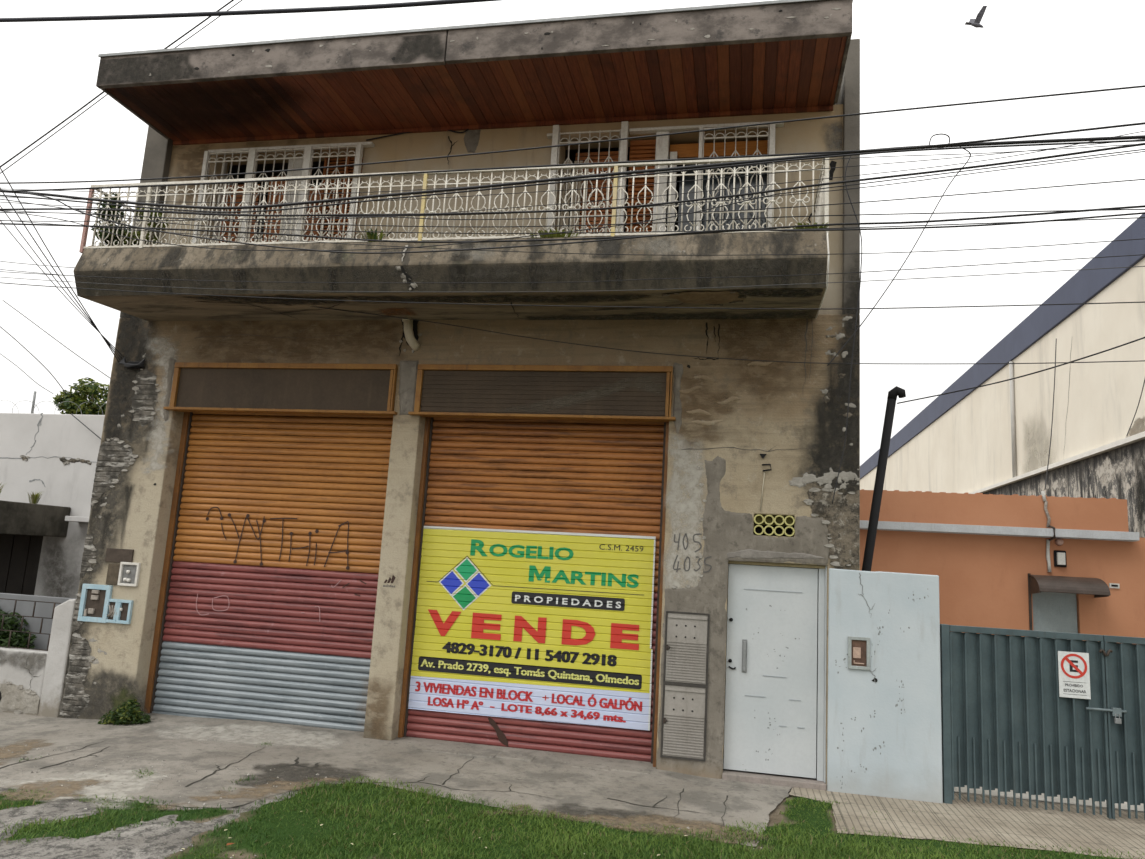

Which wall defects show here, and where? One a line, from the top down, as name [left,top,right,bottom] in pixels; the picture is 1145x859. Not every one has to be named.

leakage [394,35,443,63]
crack [0,413,91,487]
spalling [59,353,161,518]
leakage [45,313,175,598]
leakage [186,234,813,393]
peeling [665,437,707,589]
leakage [730,232,823,298]
spalling [789,468,860,567]
leakage [800,258,860,495]
leakage [1117,456,1145,536]
leakage [63,621,87,693]
spalling [59,534,107,718]